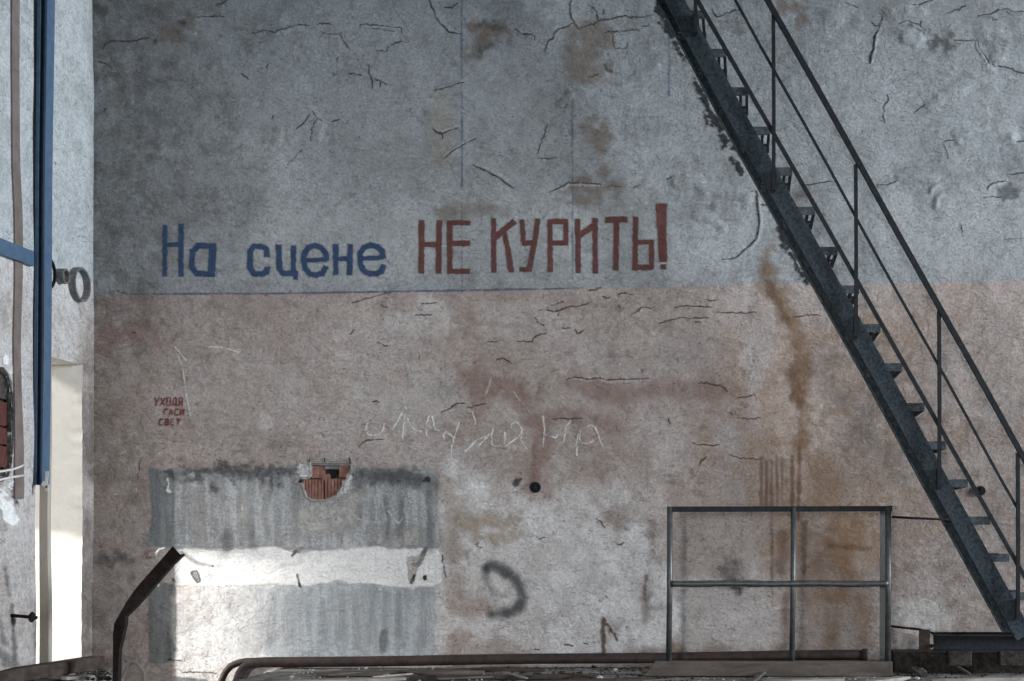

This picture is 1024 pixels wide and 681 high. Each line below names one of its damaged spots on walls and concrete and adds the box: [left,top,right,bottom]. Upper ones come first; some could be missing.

crack [252,23,402,89]
crack [429,0,461,34]
crack [512,0,649,51]
crack [846,0,1024,74]
crack [272,111,339,165]
crack [433,124,516,189]
crack [549,182,601,195]
crack [983,172,1024,198]
crack [721,190,767,263]
crack [468,287,755,363]
spalling [0,353,20,526]
spalling [292,457,353,503]